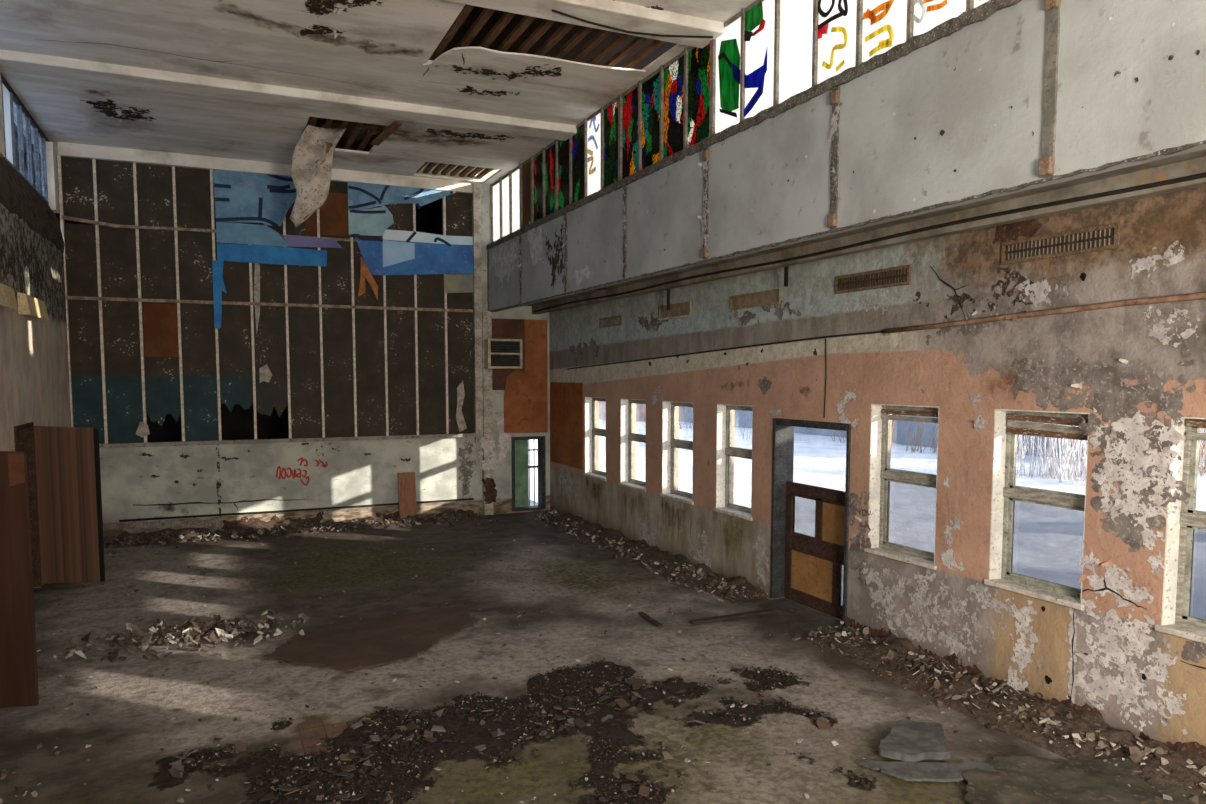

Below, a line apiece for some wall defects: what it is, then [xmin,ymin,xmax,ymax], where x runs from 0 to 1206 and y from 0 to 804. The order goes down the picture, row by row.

leakage [218,0,422,54]
leakage [80,99,156,122]
peeling [846,305,1206,760]